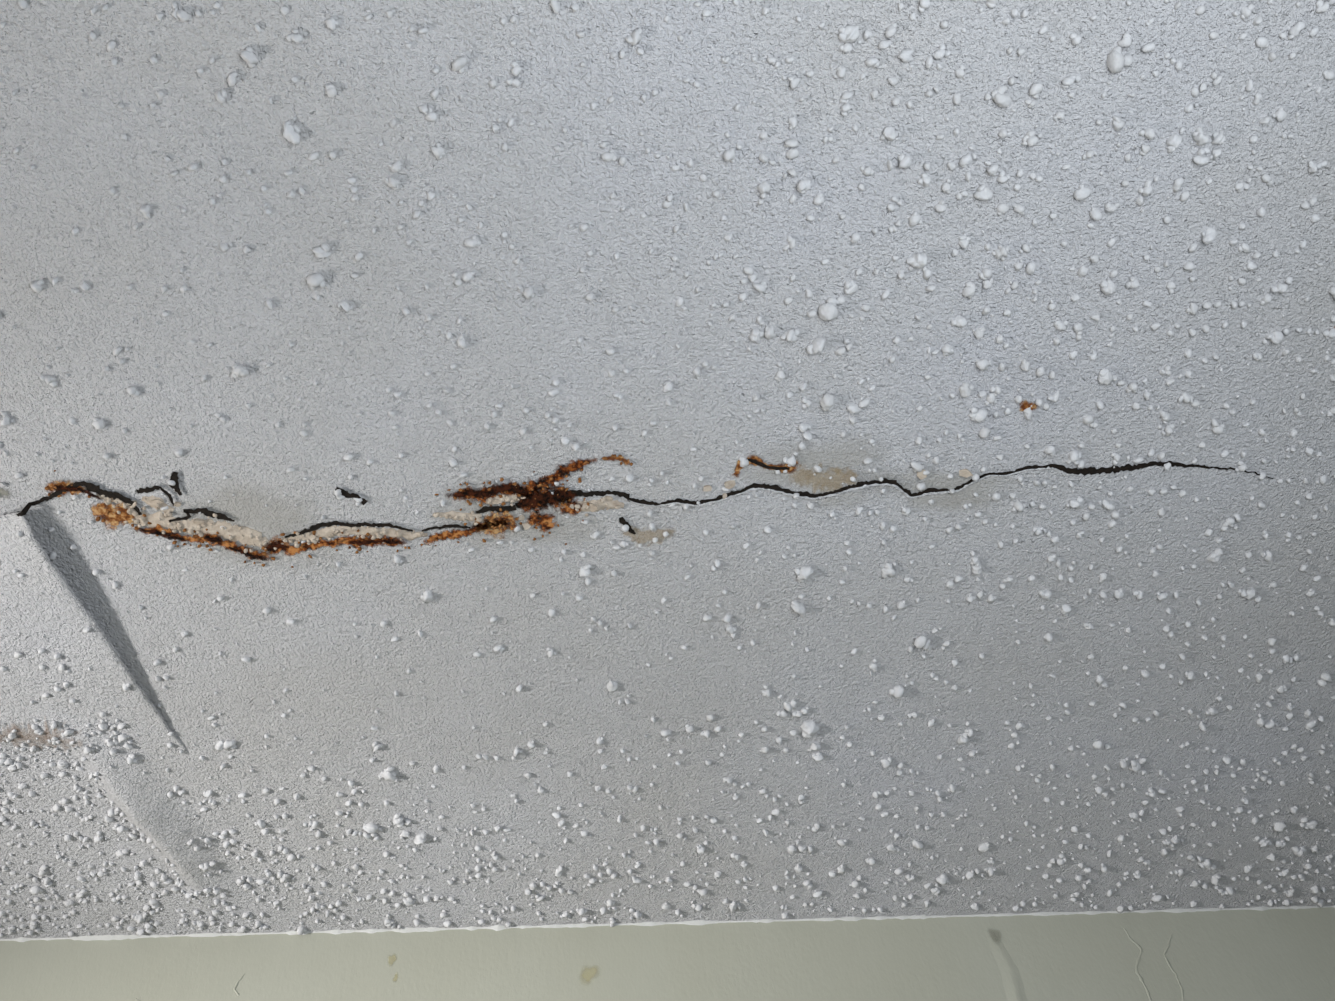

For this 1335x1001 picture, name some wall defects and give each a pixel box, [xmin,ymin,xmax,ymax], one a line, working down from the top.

crack [16,472,235,522]
corrosion [44,454,633,568]
crack [284,487,522,538]
crack [569,459,1273,535]